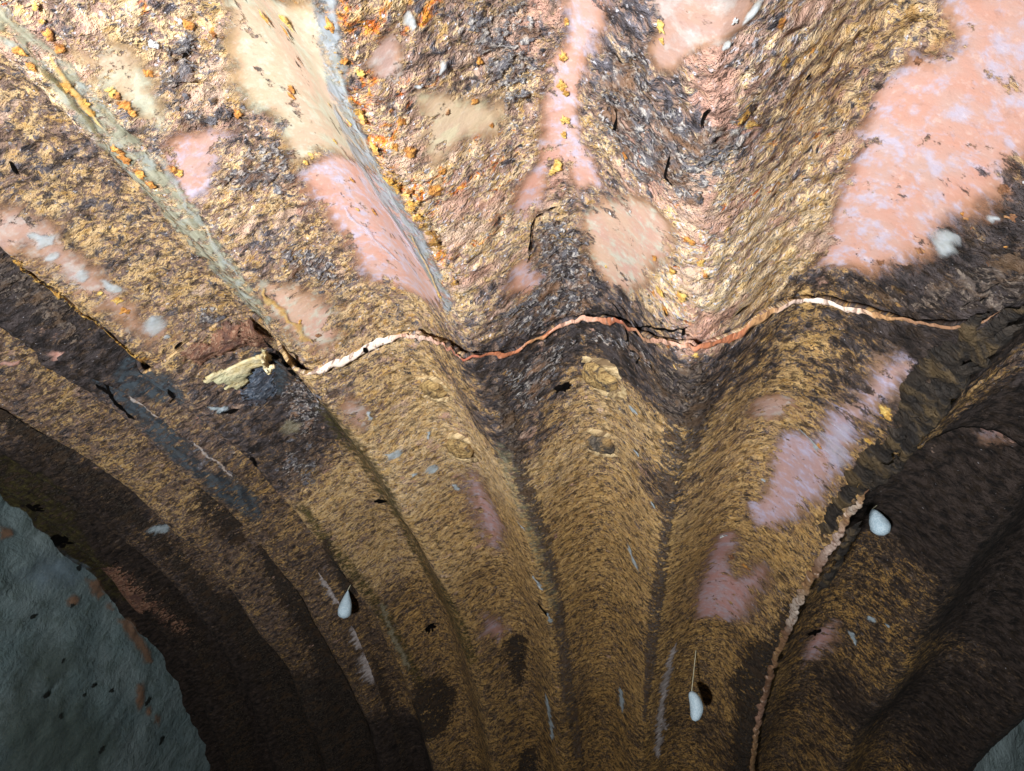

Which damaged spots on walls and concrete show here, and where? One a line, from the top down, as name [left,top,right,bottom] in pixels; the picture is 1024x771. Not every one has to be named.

rust [334,52,373,96]
rust [346,99,368,130]
water stain [314,0,452,312]
rust [368,143,461,298]
water stain [935,231,958,255]
crack [612,303,687,383]
peeling [203,348,276,390]